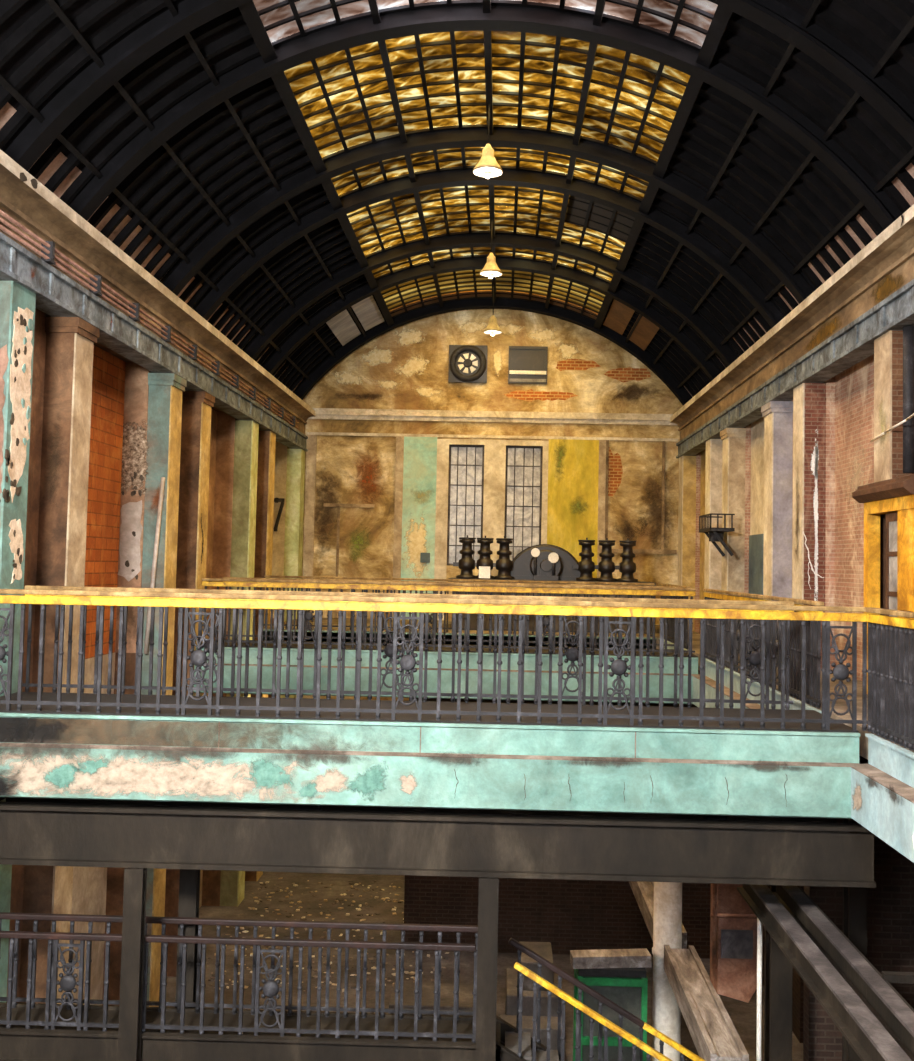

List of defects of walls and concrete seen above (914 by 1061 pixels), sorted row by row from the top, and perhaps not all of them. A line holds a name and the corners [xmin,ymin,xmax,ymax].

peeling [0,307,34,502]
damp [315,477,338,551]
peeling [8,519,24,584]
peeling [0,753,304,801]
peeling [311,769,347,798]
peeling [400,775,417,794]